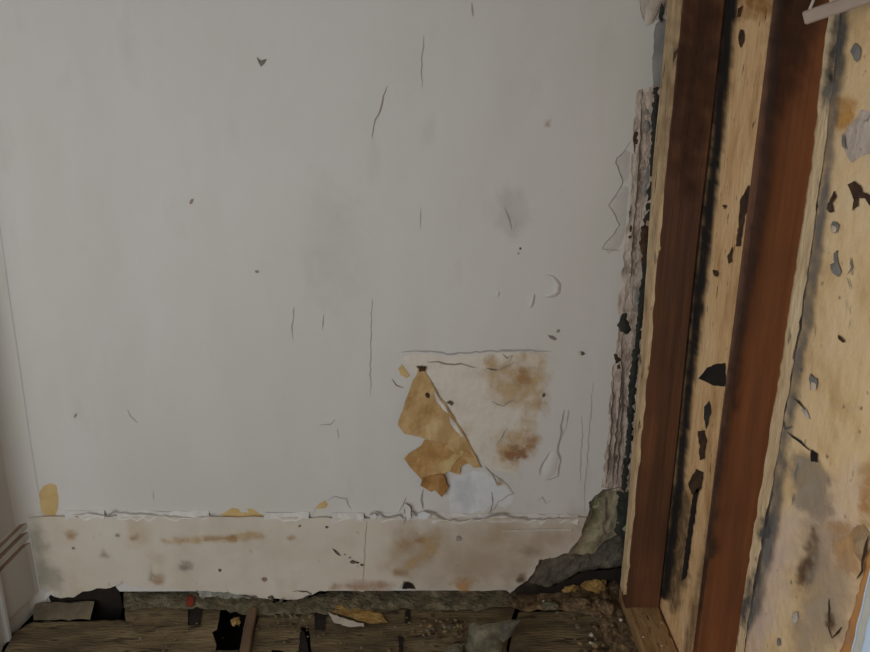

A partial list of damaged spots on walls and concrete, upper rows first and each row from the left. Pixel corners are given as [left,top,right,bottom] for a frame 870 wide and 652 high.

peeling [638,0,668,26]
spalling [850,43,861,62]
crack [371,88,387,136]
spalling [841,109,870,163]
spalling [826,192,839,233]
spalling [847,181,870,210]
peeling [376,86,660,595]
leakage [741,12,854,633]
peeling [38,483,104,521]
peeling [220,496,364,528]
leakage [795,535,843,651]